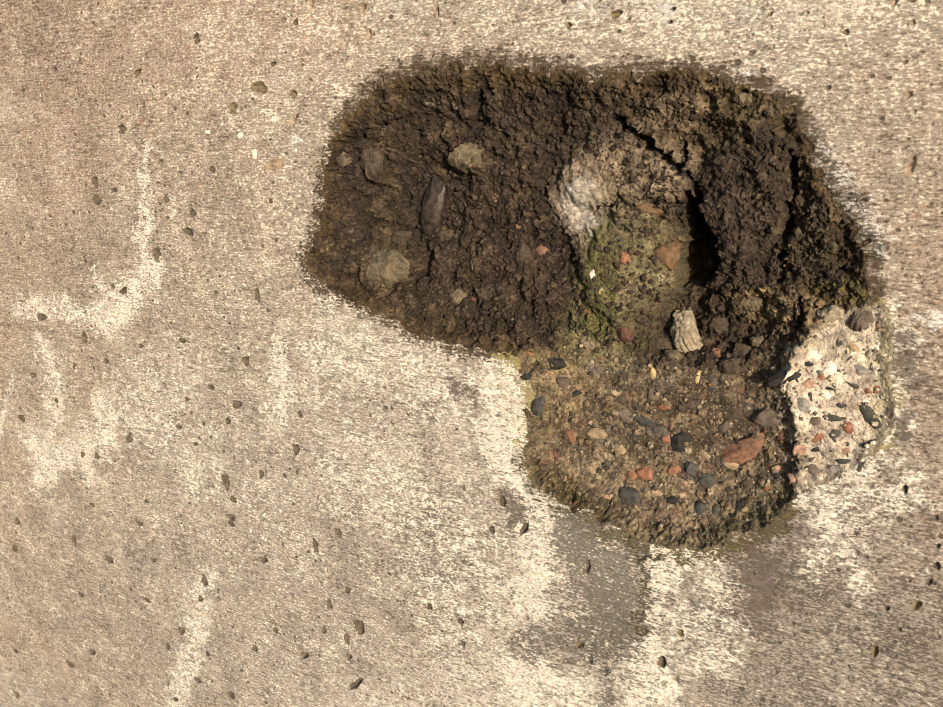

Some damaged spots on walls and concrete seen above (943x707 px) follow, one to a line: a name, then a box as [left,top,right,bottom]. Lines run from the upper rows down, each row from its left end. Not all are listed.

spalling [304,60,896,552]